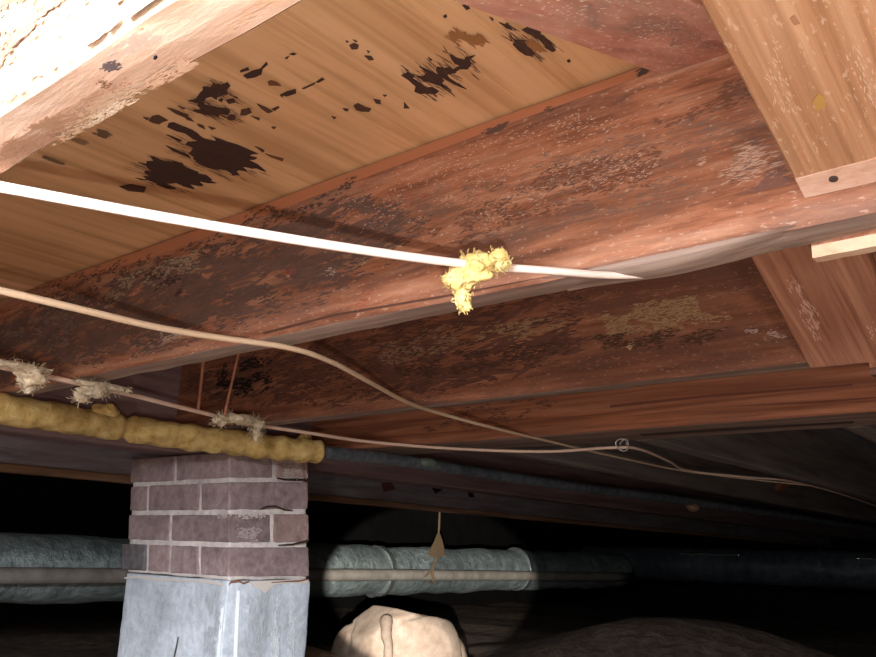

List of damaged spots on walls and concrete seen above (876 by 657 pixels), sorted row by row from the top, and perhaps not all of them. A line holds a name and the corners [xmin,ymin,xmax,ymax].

damp [401,27,490,102]
damp [489,16,571,63]
damp [0,62,793,388]
damp [179,270,766,410]